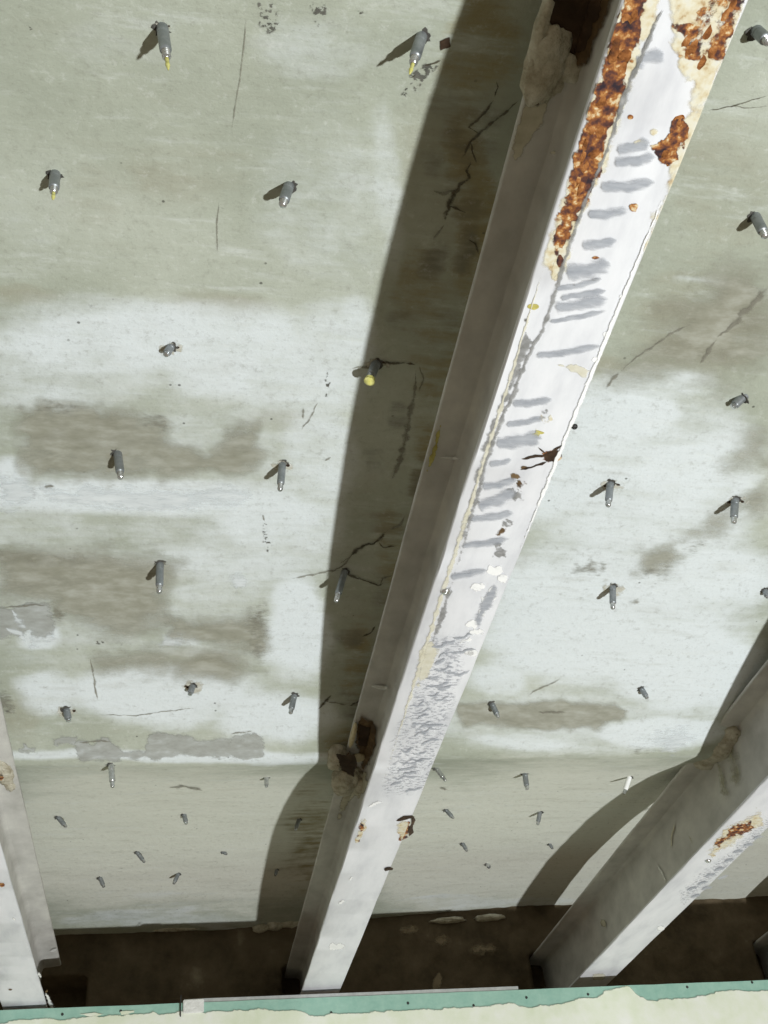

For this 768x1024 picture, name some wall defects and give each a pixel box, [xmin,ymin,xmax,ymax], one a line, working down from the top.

crack [434,84,518,238]
corrosion [544,0,745,281]
leakage [18,405,263,474]
crack [356,362,424,474]
corrosion [507,409,562,501]
crack [298,520,403,586]
corrosion [495,519,513,557]
leakage [0,551,266,680]
peeling [54,731,264,762]
spalling [336,751,357,777]
leakage [457,701,625,730]
corrosion [709,812,763,857]